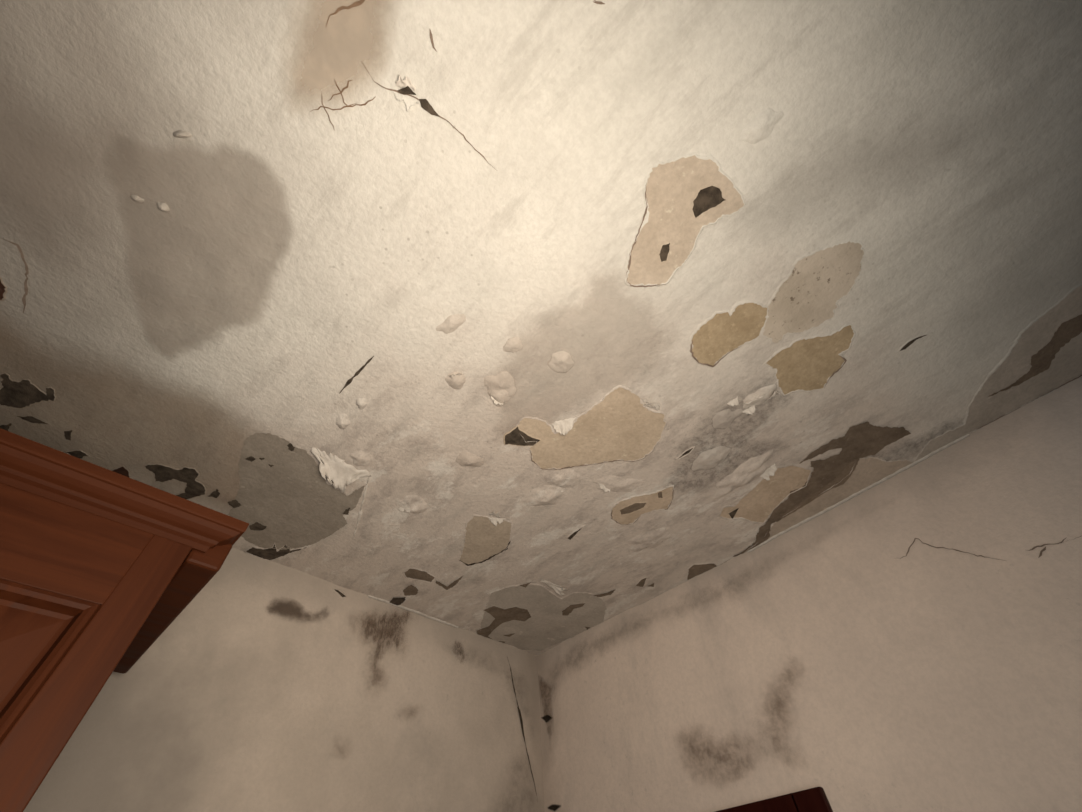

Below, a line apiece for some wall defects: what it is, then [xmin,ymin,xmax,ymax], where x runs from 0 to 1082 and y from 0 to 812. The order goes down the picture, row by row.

leakage [306,0,376,87]
crack [326,0,365,26]
crack [310,59,495,169]
peeling [623,152,745,287]
peeling [689,239,865,415]
peeling [0,372,57,431]
peeling [503,384,667,470]
peeling [685,283,1082,581]
peeling [144,433,371,561]
peeling [389,511,513,605]
crack [894,536,1081,561]
peeling [476,579,616,651]